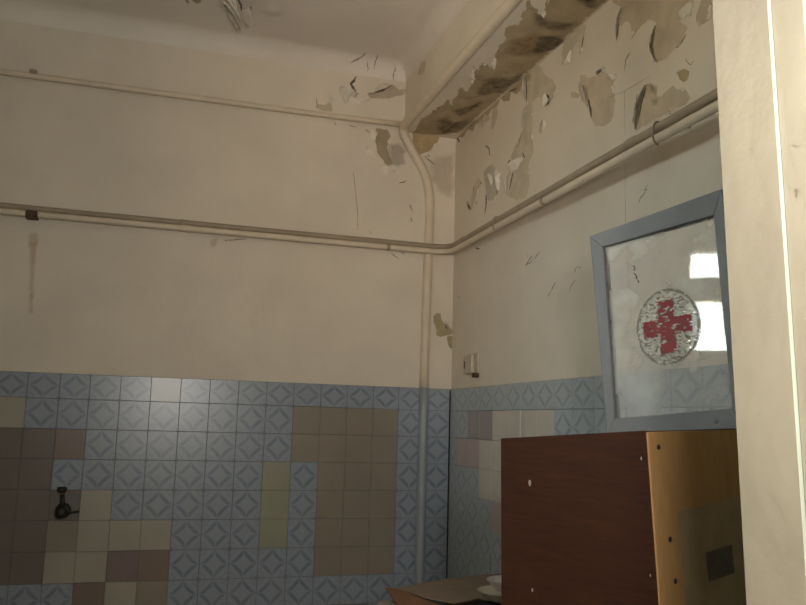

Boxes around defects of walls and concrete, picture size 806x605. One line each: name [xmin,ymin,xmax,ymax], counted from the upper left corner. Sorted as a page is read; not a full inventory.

peeling [316,68,406,112]
peeling [412,0,712,213]
peeling [365,127,395,175]
peeling [432,313,452,349]